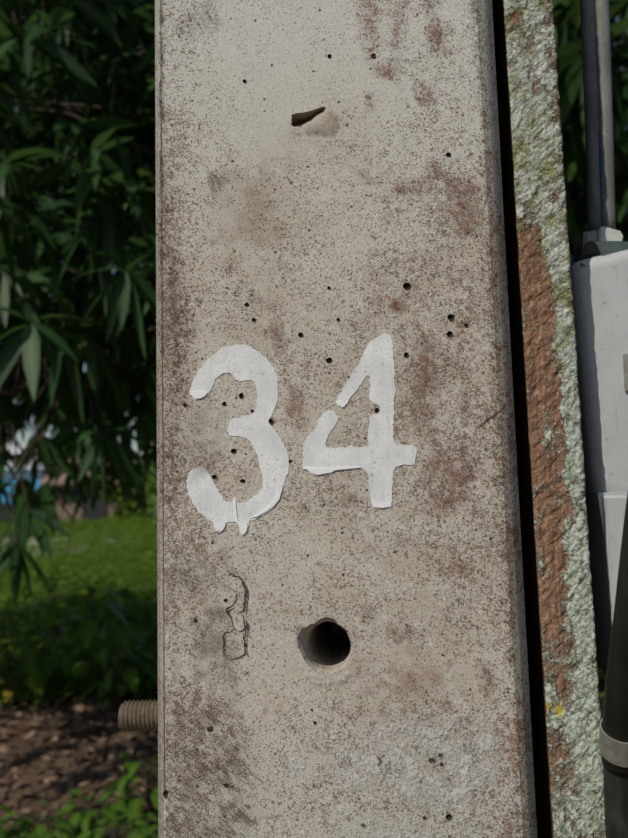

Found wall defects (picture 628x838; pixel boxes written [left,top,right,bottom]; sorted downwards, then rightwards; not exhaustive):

corrosion [353,0,411,84]
corrosion [395,0,526,838]
crack [210,574,248,671]